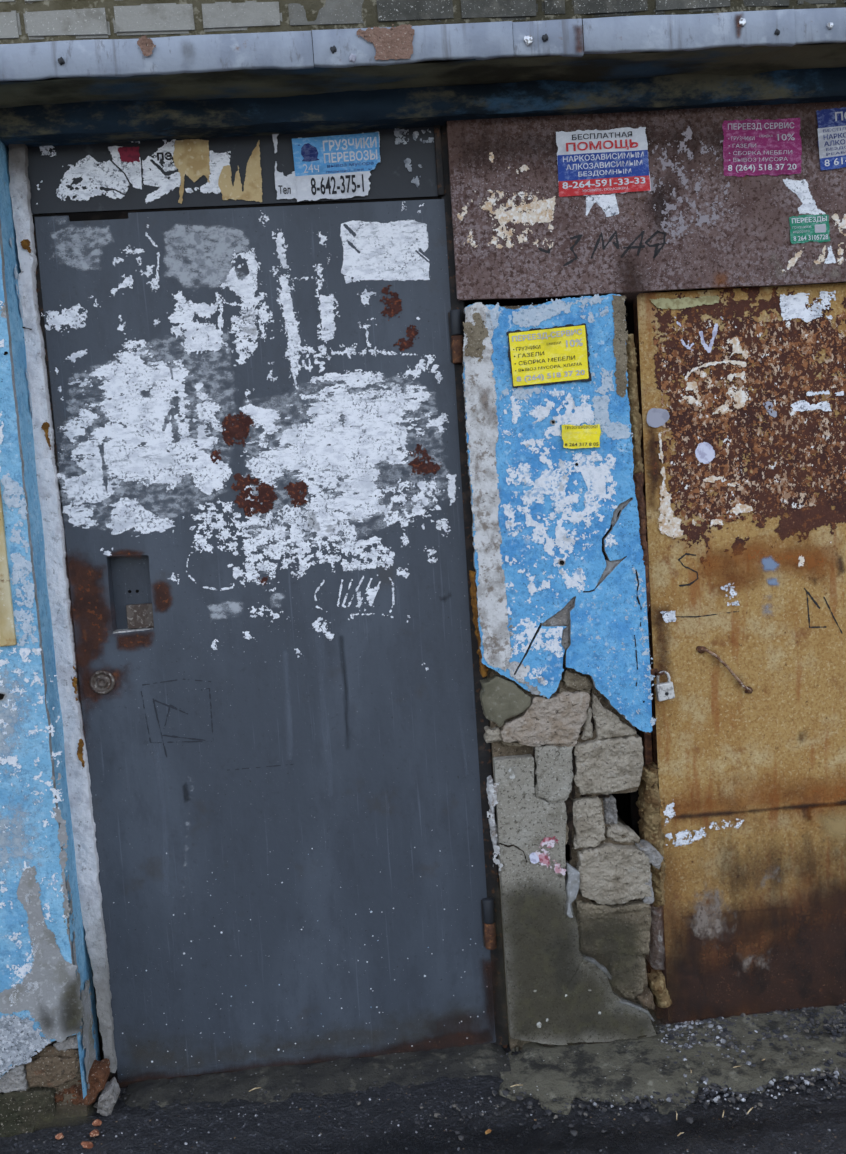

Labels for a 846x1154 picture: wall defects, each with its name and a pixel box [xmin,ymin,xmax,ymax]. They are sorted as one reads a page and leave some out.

corrosion [210,412,254,464]
corrosion [231,473,309,517]
corrosion [408,444,442,477]
crack [602,498,632,561]
corrosion [648,310,846,525]
corrosion [65,557,151,701]
crack [514,623,541,674]
peeling [463,294,753,1022]
crack [634,570,642,686]
spalling [0,412,121,1116]
corrosion [674,784,846,818]
corrosion [663,886,846,1024]